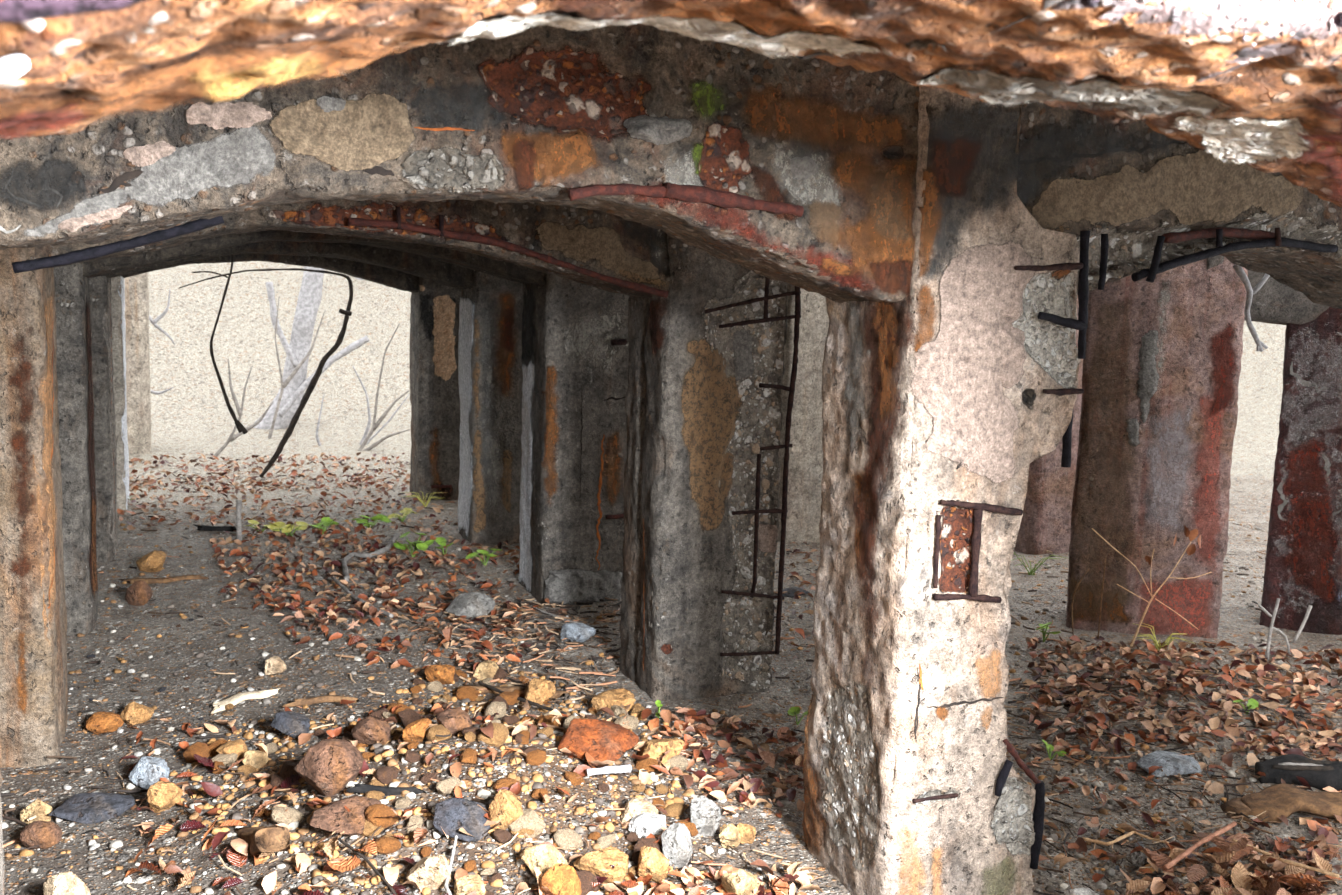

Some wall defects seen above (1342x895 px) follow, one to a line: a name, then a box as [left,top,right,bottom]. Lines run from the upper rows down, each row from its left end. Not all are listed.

peeling [911,0,1342,483]
spalling [681,270,786,691]
rust [634,79,934,682]
spalling [933,499,1023,603]
rust [1141,576,1213,636]
rust [1196,324,1237,564]
rust [1283,440,1339,602]